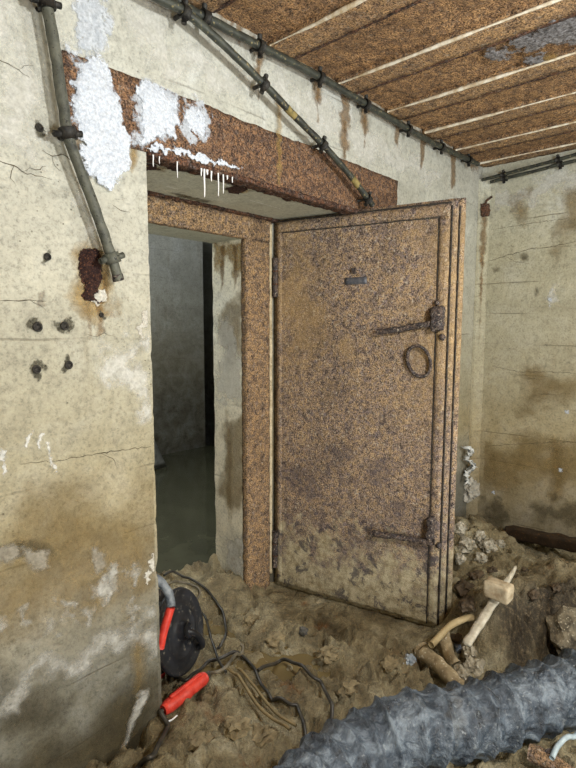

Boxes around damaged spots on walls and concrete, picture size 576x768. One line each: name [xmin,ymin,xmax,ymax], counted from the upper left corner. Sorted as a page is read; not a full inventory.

peeling [484,17,576,65]
water stain [65,0,240,197]
rust [341,95,350,156]
crack [0,151,68,185]
rust [96,264,109,291]
rust [75,283,104,329]
crack [26,446,151,468]
water stain [0,543,49,570]
water stain [92,548,117,597]
water stain [41,632,157,674]
water stain [30,683,148,768]